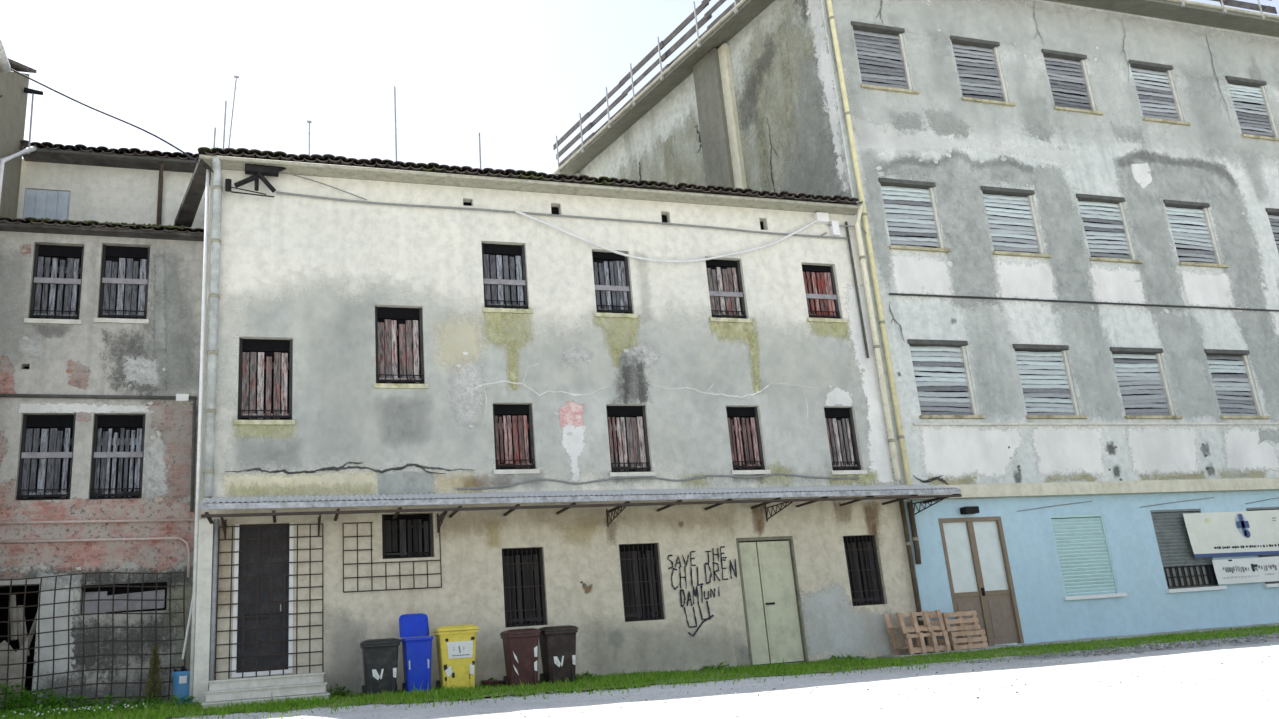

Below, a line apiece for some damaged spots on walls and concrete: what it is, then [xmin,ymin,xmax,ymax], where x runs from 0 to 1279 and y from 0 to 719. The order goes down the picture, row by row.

crack [767,118,779,192]
damp [739,23,842,196]
flaking render [0,333,198,698]
crack [225,462,474,474]
damp [224,284,874,496]